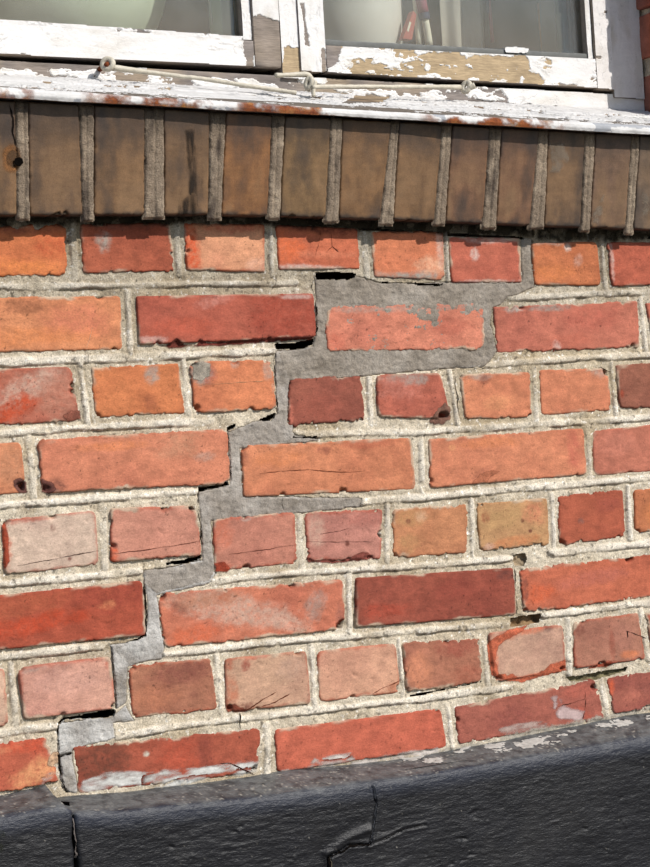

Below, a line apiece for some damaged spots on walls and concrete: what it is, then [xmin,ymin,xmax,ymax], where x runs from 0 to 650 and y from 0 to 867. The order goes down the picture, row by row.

peeling [282,46,302,73]
peeling [347,47,559,85]
crack [381,279,443,287]
crack [202,232,356,421]
crack [18,424,236,566]
crack [130,587,148,641]
crack [239,692,289,729]
crack [57,651,117,858]
crack [328,790,423,867]